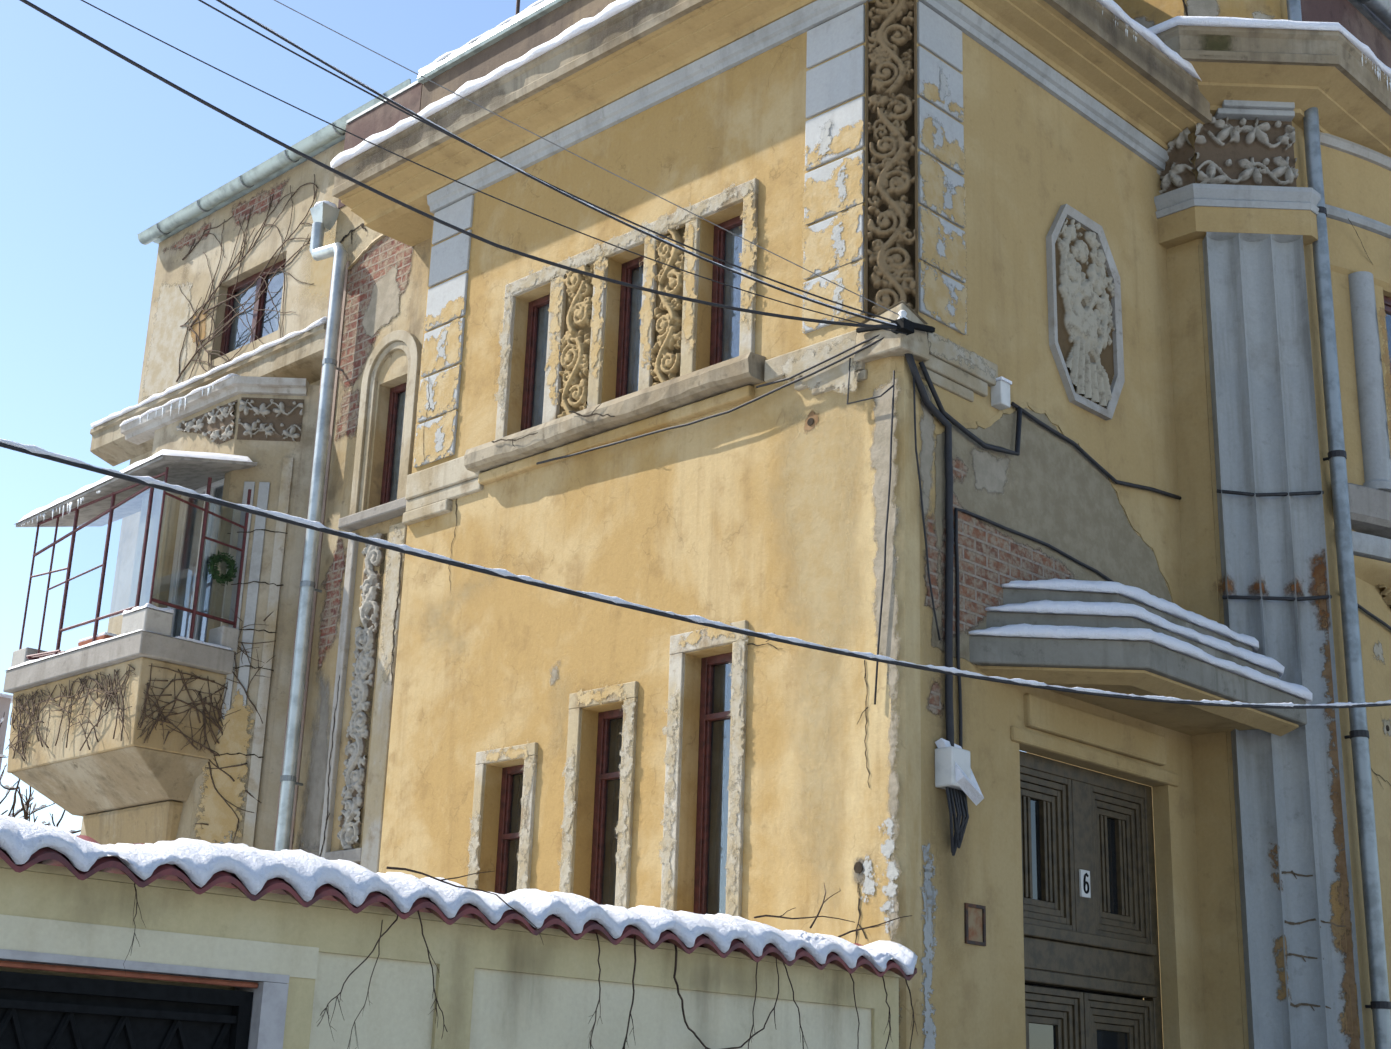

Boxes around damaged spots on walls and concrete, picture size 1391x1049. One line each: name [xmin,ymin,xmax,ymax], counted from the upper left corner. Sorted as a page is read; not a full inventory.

flaking render [308,234,413,440]
peeling [413,296,465,467]
peeling [678,621,748,916]
spalling [804,411,819,433]
peeling [776,119,863,393]
peeling [854,379,901,940]
peeling [920,843,938,1049]
peeling [920,70,996,377]
spalling [919,385,1175,665]
peeling [1269,845,1283,890]
peeling [1273,935,1291,1001]
peeling [1309,550,1360,1049]